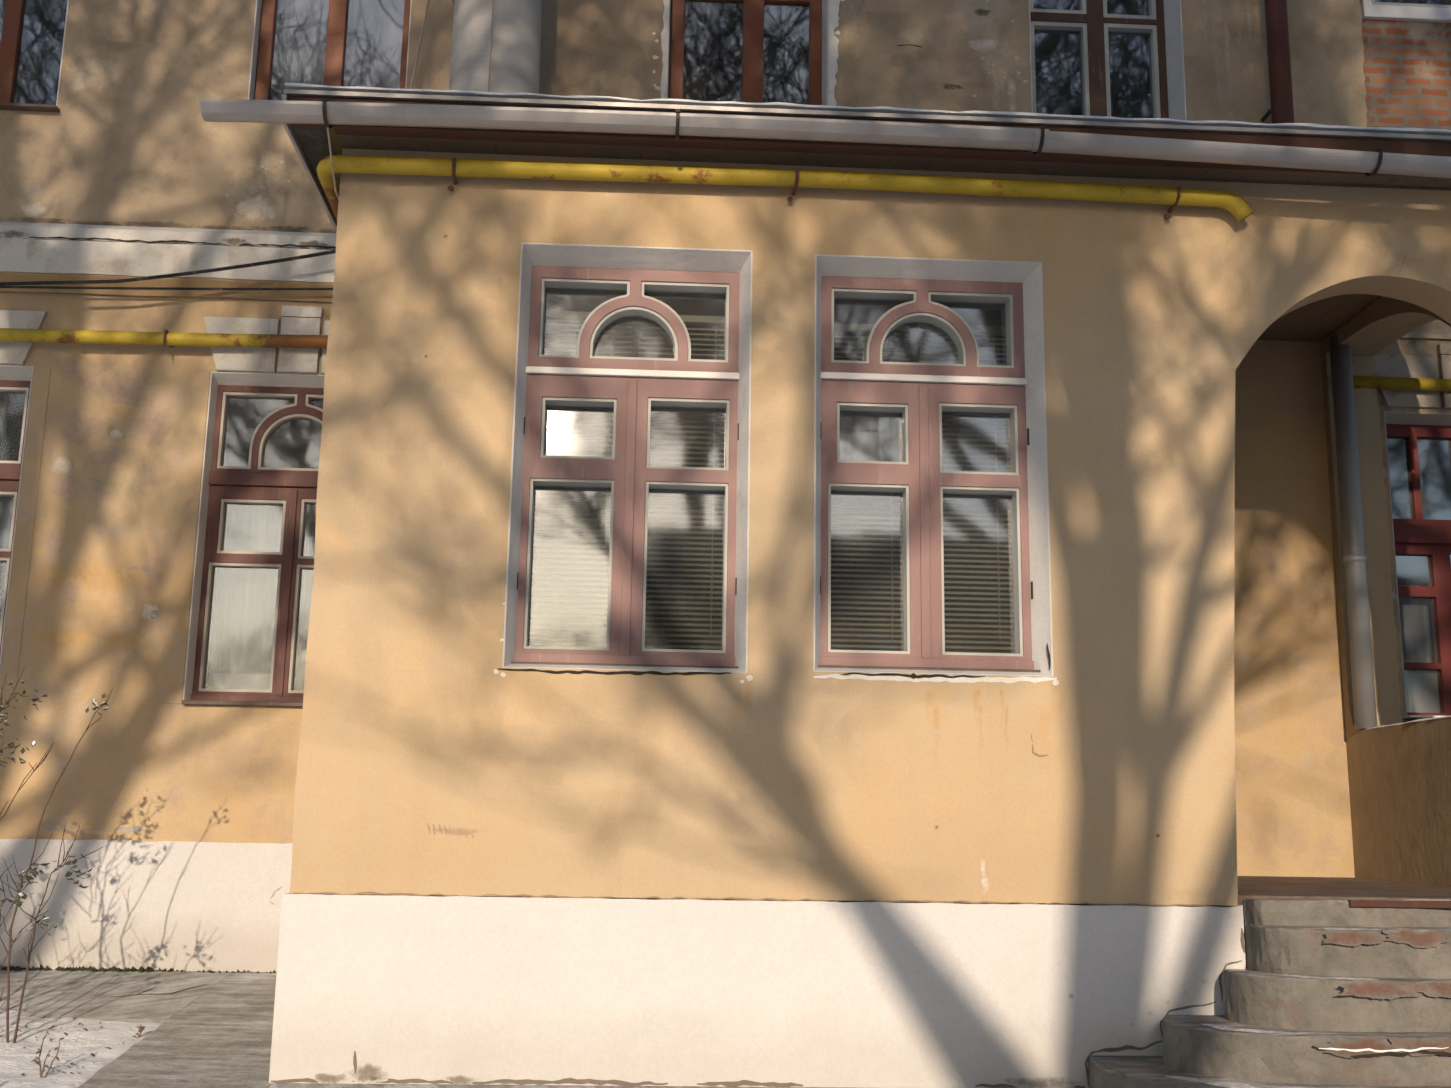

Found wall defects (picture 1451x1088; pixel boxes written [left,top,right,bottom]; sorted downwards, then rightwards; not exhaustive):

flaking render [1359,0,1451,130]
peeling [223,150,290,225]